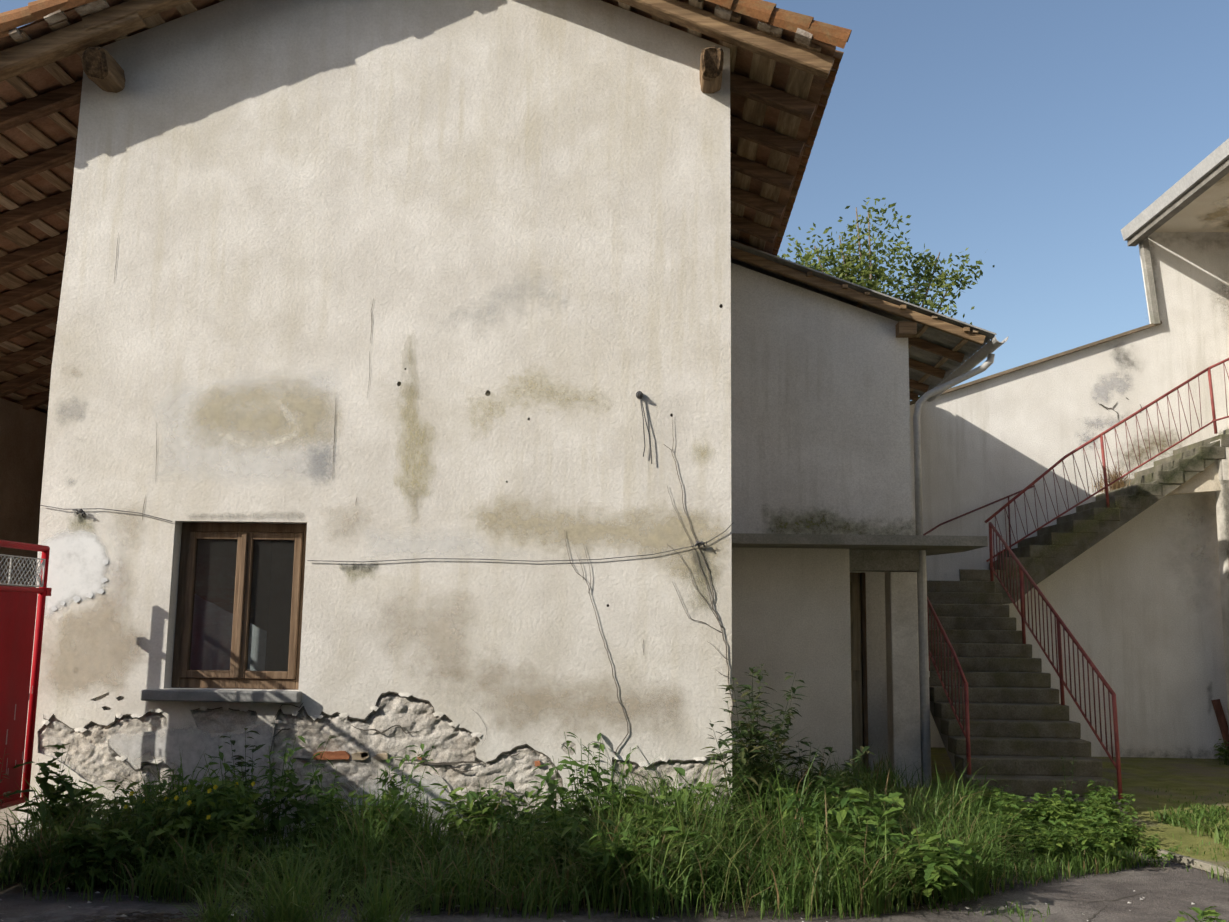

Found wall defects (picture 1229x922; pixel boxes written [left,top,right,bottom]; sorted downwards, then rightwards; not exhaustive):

peeling [39,532,109,614]
damp [482,511,720,582]
flaking render [39,693,178,795]
flaking render [192,691,563,818]
flaking render [609,754,731,824]